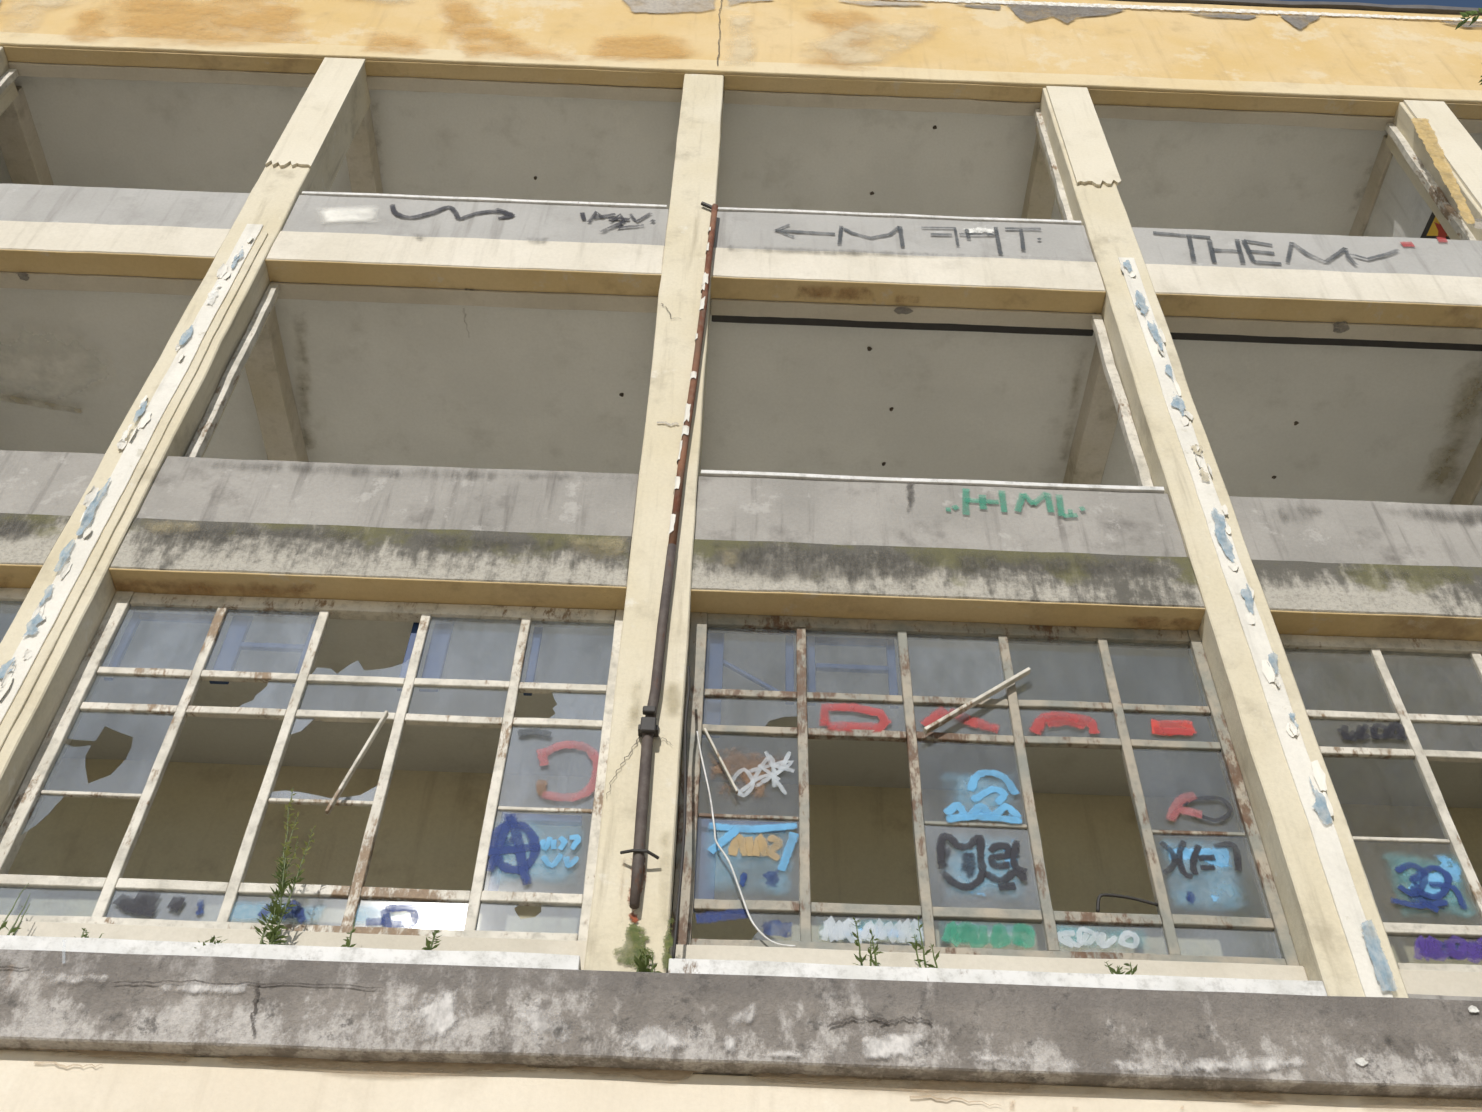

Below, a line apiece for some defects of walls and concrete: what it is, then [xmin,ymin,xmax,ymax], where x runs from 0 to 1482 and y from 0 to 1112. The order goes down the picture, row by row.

peeling [1120,260,1193,426]
peeling [0,478,111,700]
peeling [1211,504,1255,624]
peeling [1309,760,1334,824]
peeling [1361,920,1397,991]
crack [114,979,376,1036]
damp [418,992,455,1036]
damp [355,1061,535,1076]
damp [567,1066,696,1081]
damp [863,1034,918,1058]
damp [904,1080,1031,1093]
damp [1194,1058,1302,1071]